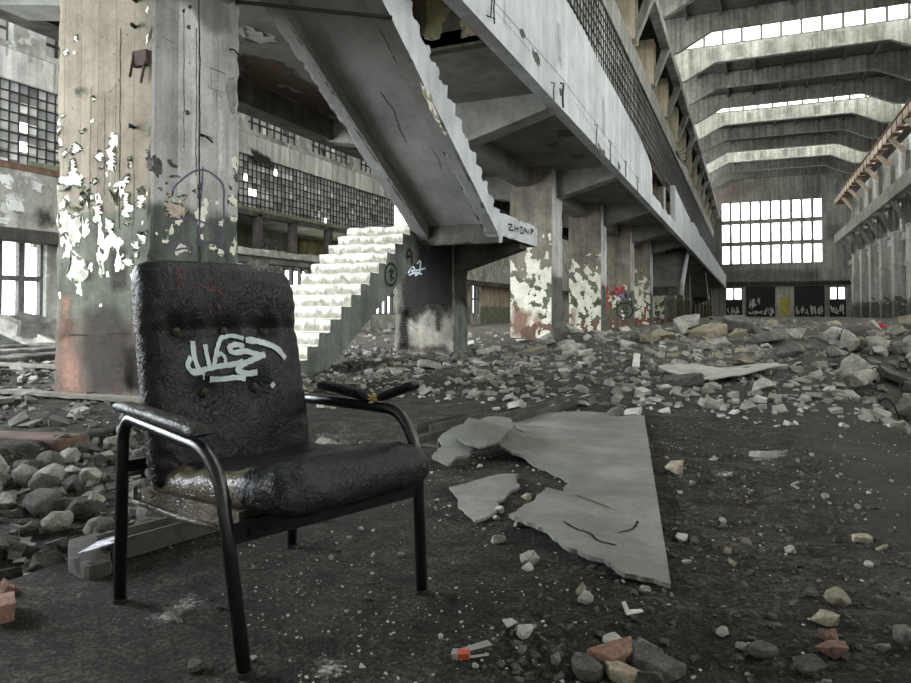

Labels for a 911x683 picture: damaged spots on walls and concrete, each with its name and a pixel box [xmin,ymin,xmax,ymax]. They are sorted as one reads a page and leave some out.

peeling [0,172,25,226]
peeling [30,179,43,193]
peeling [56,113,238,296]
corrosion [60,298,80,393]
damp [399,309,449,353]
peeling [510,233,551,338]
peeling [569,253,664,331]